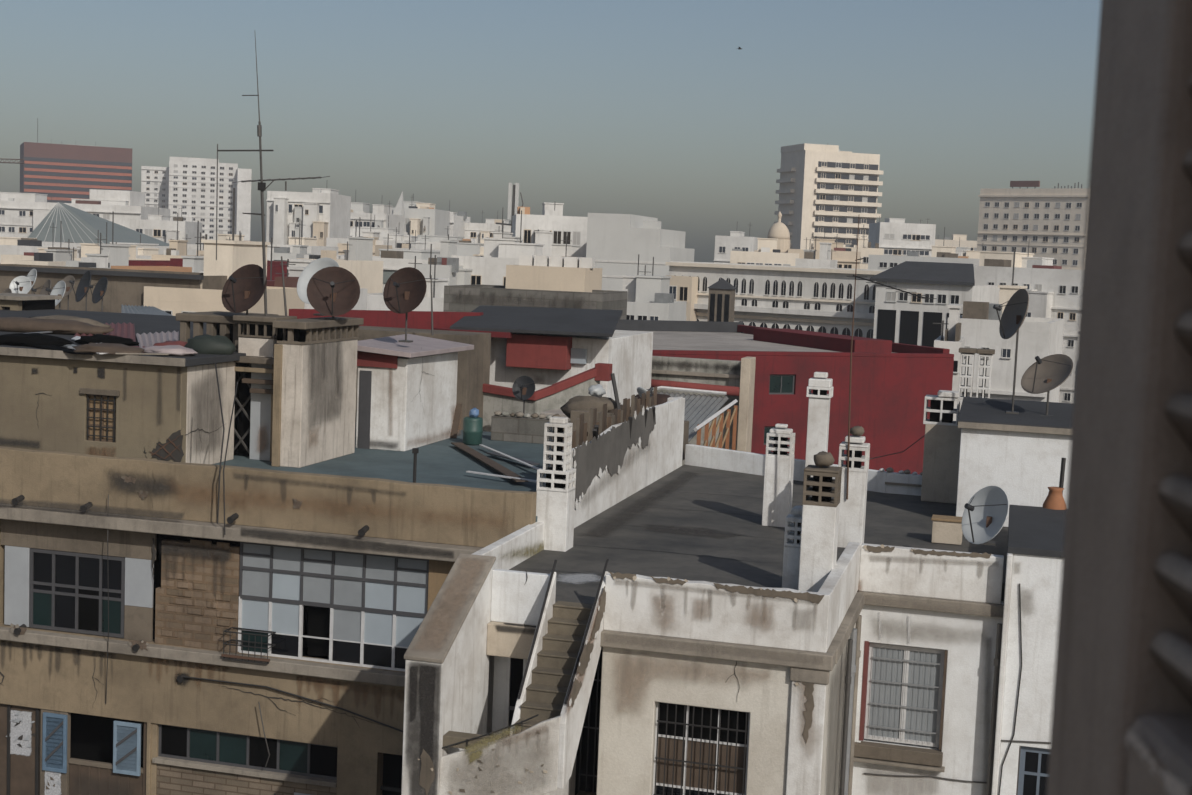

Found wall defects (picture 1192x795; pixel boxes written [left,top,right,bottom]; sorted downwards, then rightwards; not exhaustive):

spalling [144,428,185,462]
peeling [573,405,656,501]
water stain [112,475,174,495]
peeling [713,583,824,604]
spalling [794,681,814,743]